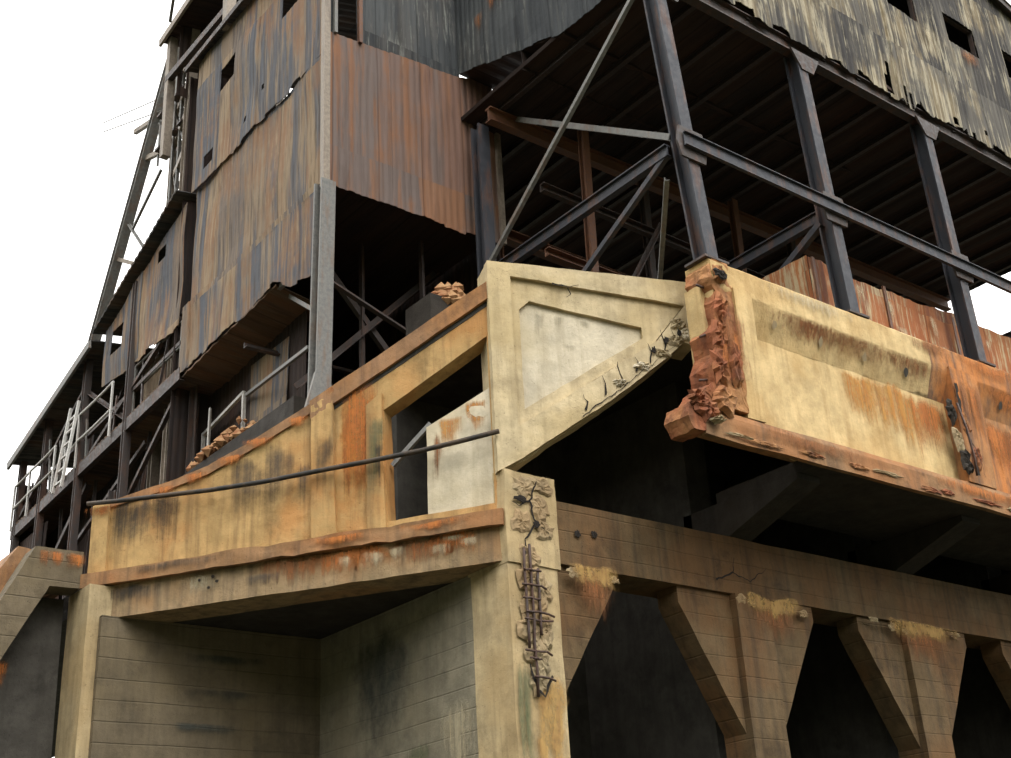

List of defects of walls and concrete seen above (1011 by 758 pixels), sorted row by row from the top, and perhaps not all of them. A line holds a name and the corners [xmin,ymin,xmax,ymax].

corrosion [341,389,373,483]
crack [583,329,676,417]
spalling [687,265,784,450]
corrosion [892,354,929,375]
corrosion [953,362,1011,464]
corrosion [947,480,1011,502]
spalling [510,475,557,698]
peeling [566,564,620,608]
peeling [736,592,809,632]
peeling [869,617,960,658]